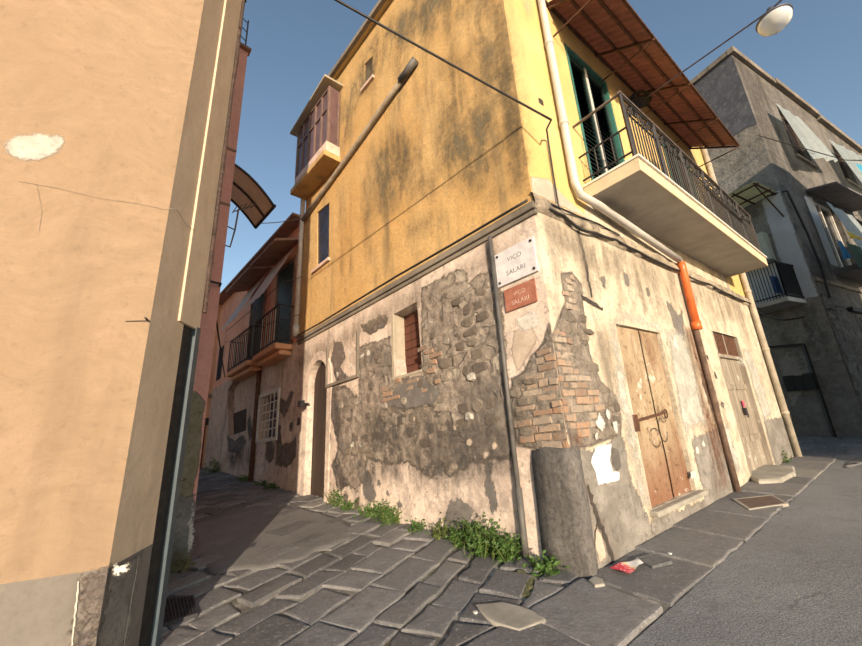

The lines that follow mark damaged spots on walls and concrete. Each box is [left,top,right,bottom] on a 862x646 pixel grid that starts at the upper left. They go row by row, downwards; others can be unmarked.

leakage [377,0,446,45]
leakage [375,138,408,205]
leakage [444,108,490,182]
spalling [330,268,622,513]
peeling [179,391,205,557]
peeling [227,435,247,454]
peeling [265,390,301,468]